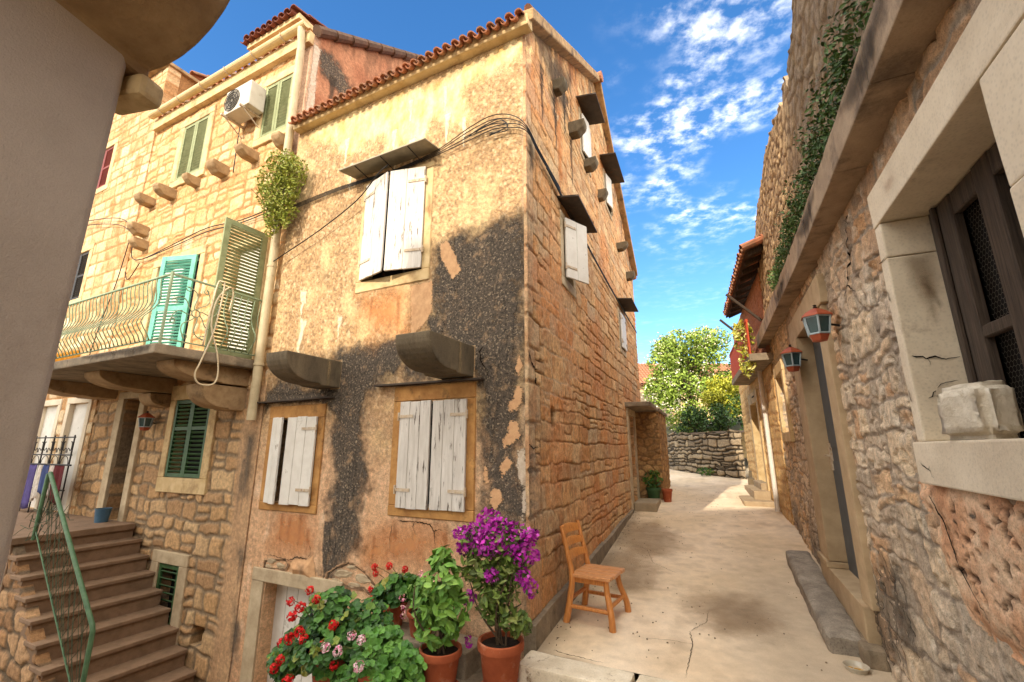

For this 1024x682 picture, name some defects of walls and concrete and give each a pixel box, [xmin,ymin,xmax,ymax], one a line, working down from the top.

flaking render [440,240,461,279]
leakage [296,290,307,353]
leakage [428,215,538,524]
crack [913,355,960,398]
leakage [265,316,431,579]
flaking render [482,354,527,521]
crack [389,520,439,551]